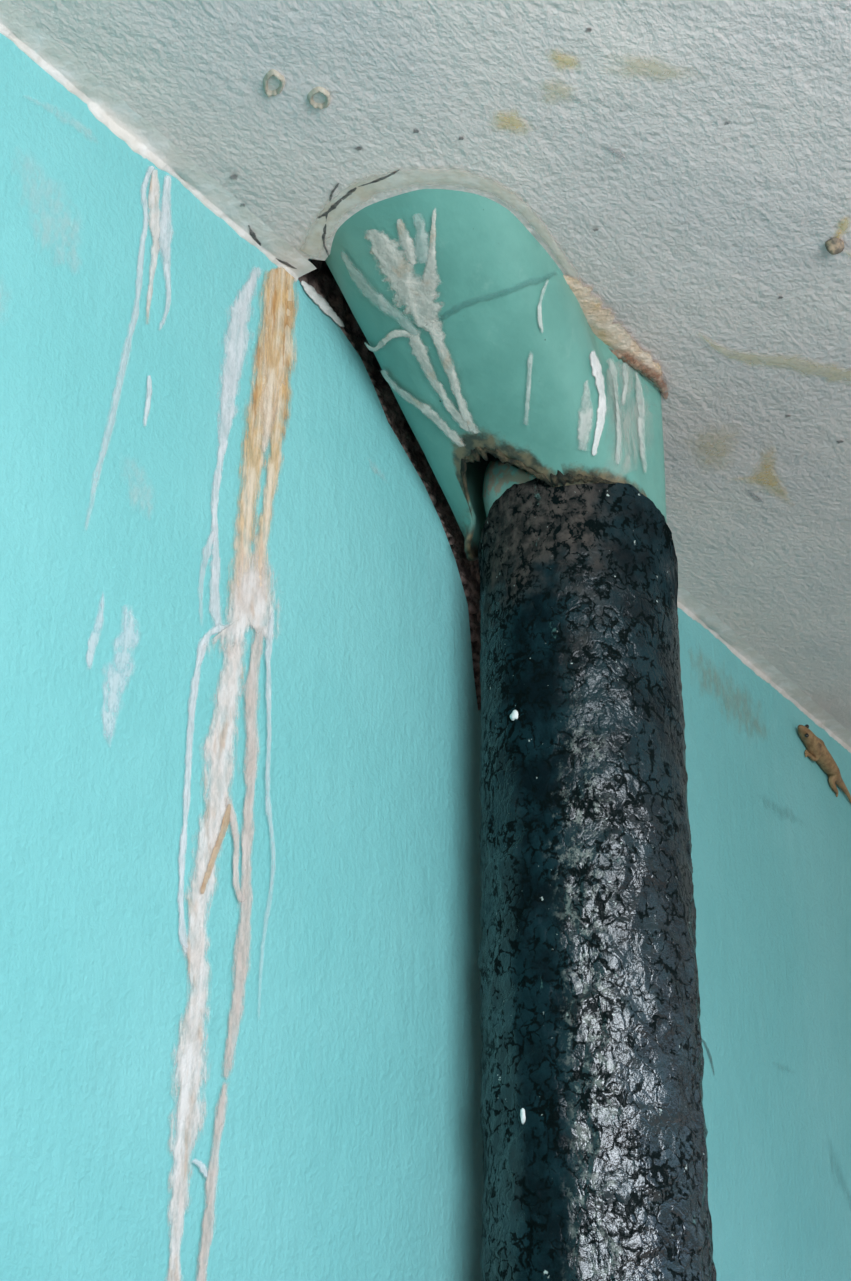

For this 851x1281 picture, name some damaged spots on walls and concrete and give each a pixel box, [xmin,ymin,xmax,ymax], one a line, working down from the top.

damp [130,166,172,331]
flaking render [301,170,668,399]
damp [538,281,548,332]
damp [578,351,646,472]
damp [87,598,103,665]
damp [103,615,136,733]
corrosion [168,267,296,1281]